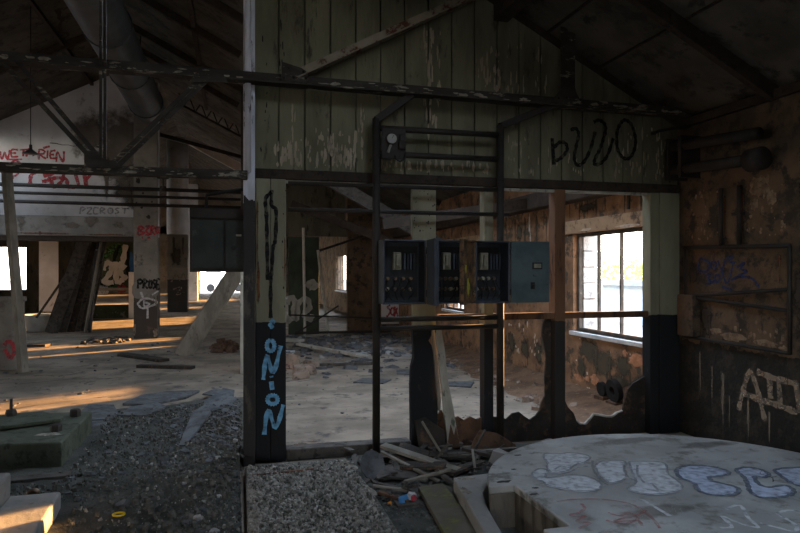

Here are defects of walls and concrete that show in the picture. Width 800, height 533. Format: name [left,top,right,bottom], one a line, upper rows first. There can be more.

peeling [423,26,441,140]
peeling [274,104,365,170]
leakage [508,332,541,364]
leakage [577,337,642,389]